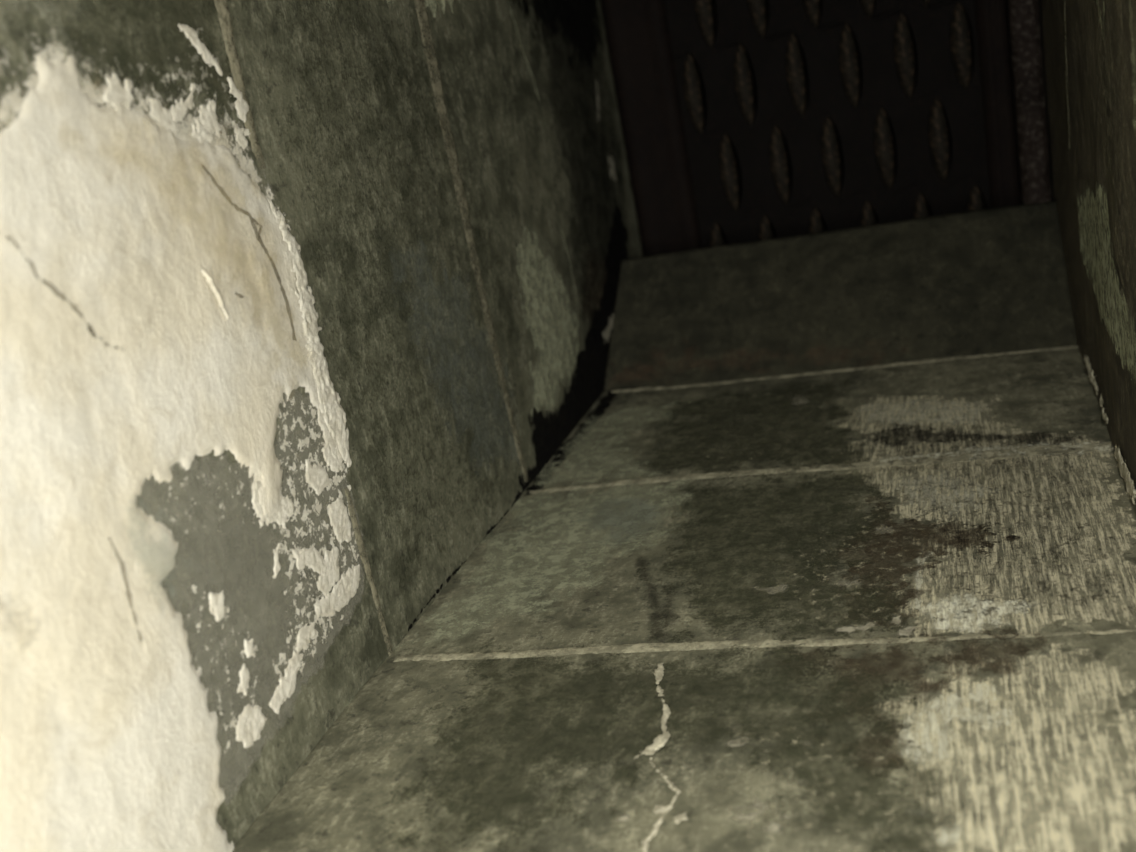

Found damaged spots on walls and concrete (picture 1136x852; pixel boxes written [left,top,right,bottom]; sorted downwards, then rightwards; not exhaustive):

peeling [79,23,253,170]
damp [425,0,464,18]
damp [1077,0,1136,380]
crack [7,237,101,339]
damp [516,228,580,417]
damp [1083,354,1108,427]
peeling [136,389,364,803]
damp [391,381,1136,852]
crack [633,662,688,852]